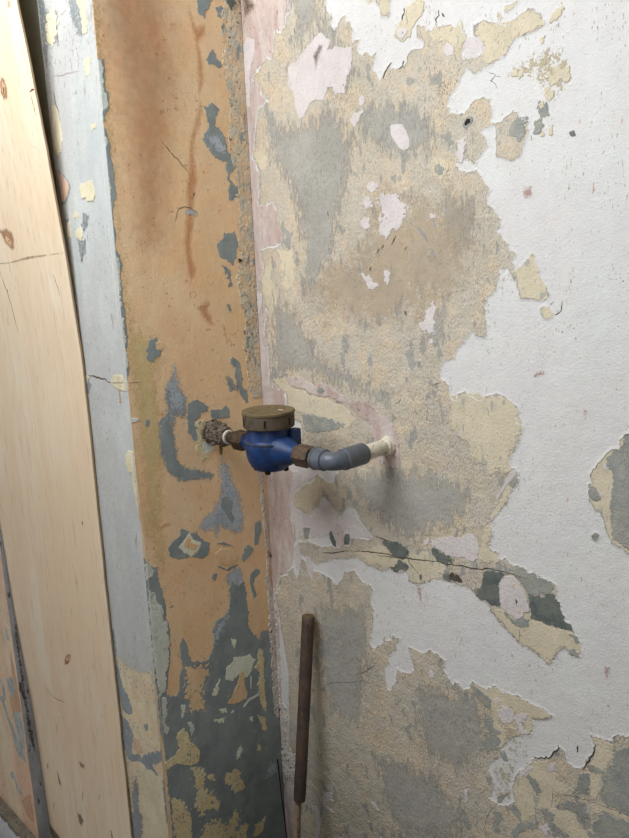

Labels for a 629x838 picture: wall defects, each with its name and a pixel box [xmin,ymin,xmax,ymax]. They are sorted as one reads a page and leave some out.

peeling [38,0,130,403]
peeling [146,337,165,362]
peeling [111,415,286,838]
peeling [157,365,244,560]
peeling [197,0,629,838]
crack [322,536,532,581]